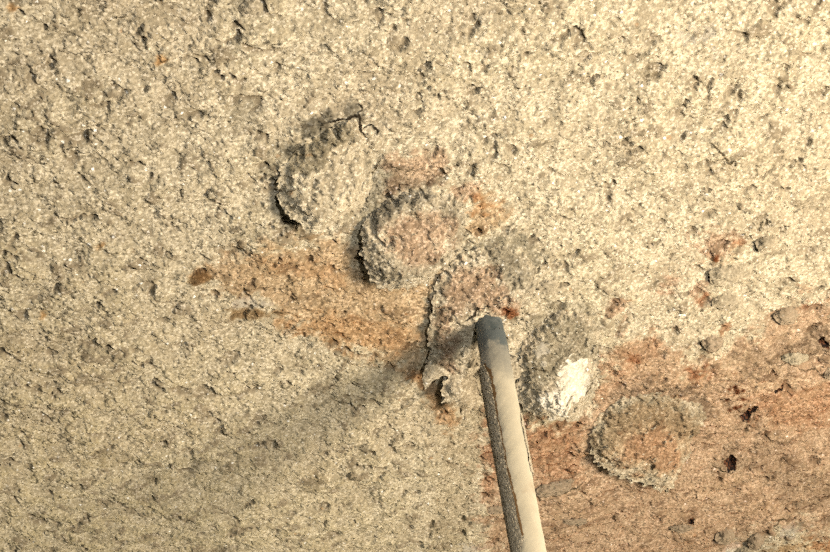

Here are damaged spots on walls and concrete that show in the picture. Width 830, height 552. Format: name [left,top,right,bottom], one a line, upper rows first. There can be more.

peeling [276,117,541,420]